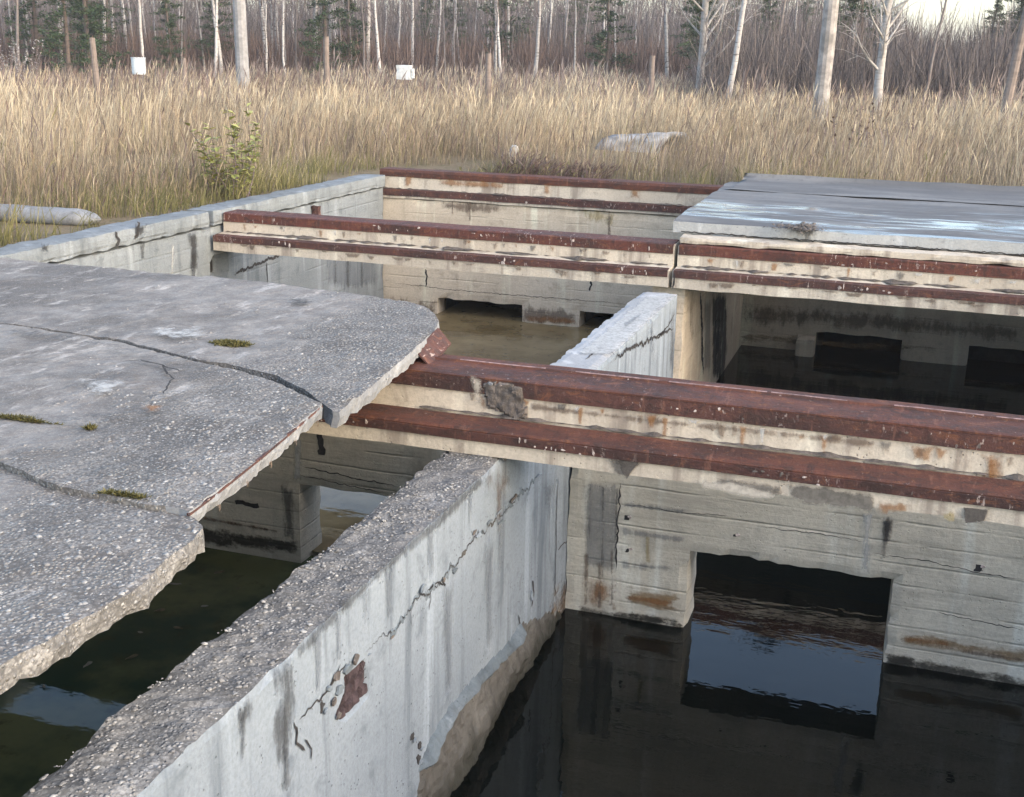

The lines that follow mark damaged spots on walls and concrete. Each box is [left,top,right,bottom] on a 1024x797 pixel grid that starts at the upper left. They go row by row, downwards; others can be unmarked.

crack [234,255,280,283]
crack [586,315,674,360]
crack [129,360,179,397]
spalling [473,380,528,421]
leakage [203,486,297,553]
spalling [343,451,492,541]
crack [615,484,726,567]
leakage [301,479,483,654]
spalling [29,545,370,797]
crack [294,473,567,759]
rust [629,593,675,609]
rust [905,637,1024,662]